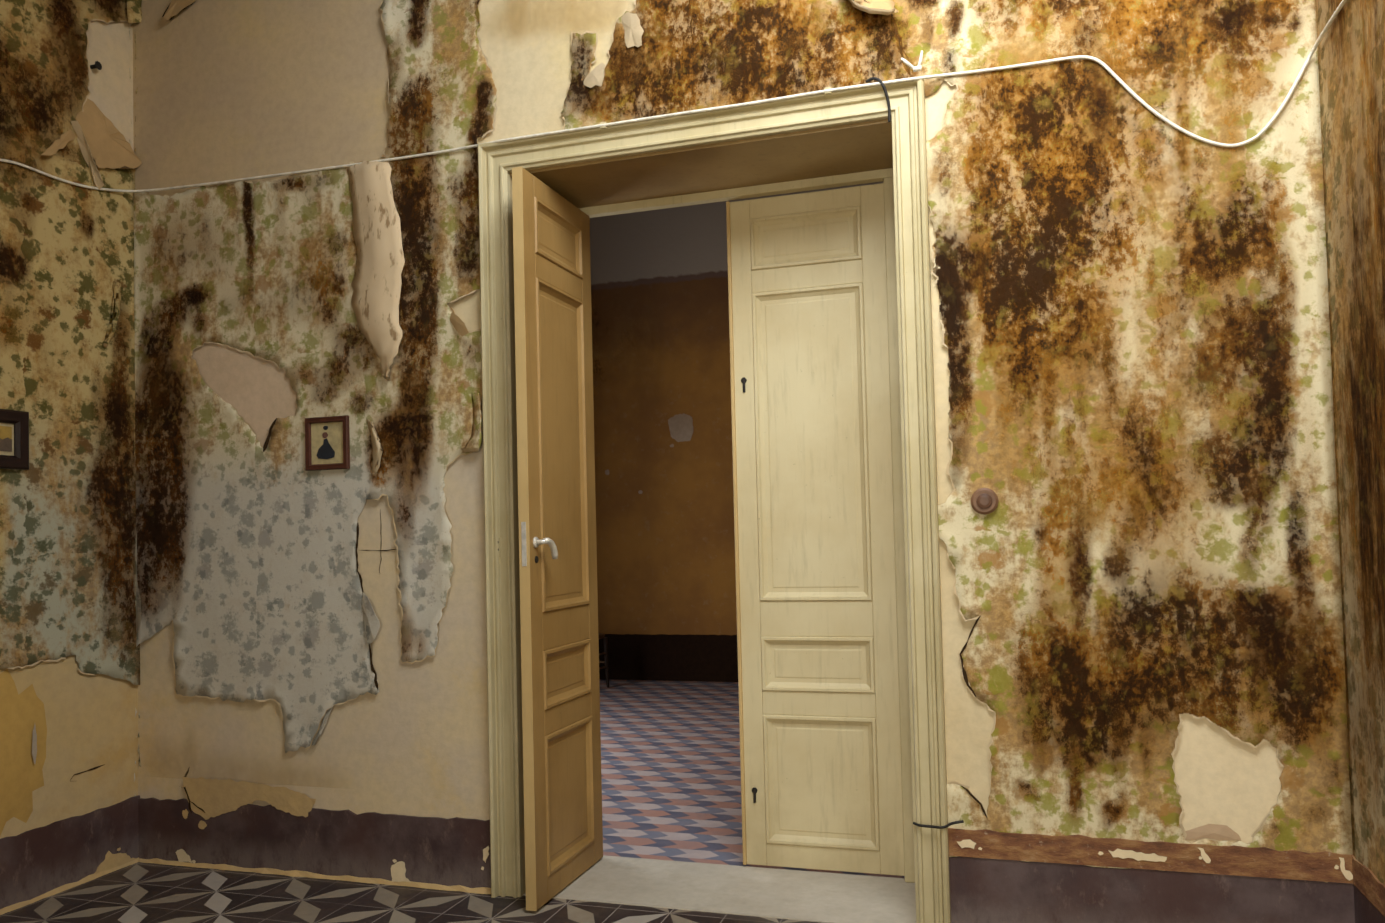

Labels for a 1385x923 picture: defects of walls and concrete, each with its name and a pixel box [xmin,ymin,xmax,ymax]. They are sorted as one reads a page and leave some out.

damp [0,241,29,284]
damp [0,0,124,224]
damp [87,283,210,658]
peeling [41,0,405,381]
peeling [191,342,297,448]
damp [294,73,494,538]
damp [396,0,429,66]
peeling [477,0,644,144]
damp [564,0,1385,817]
peeling [0,393,490,839]
peeling [1098,848,1167,862]
peeling [1171,713,1284,863]